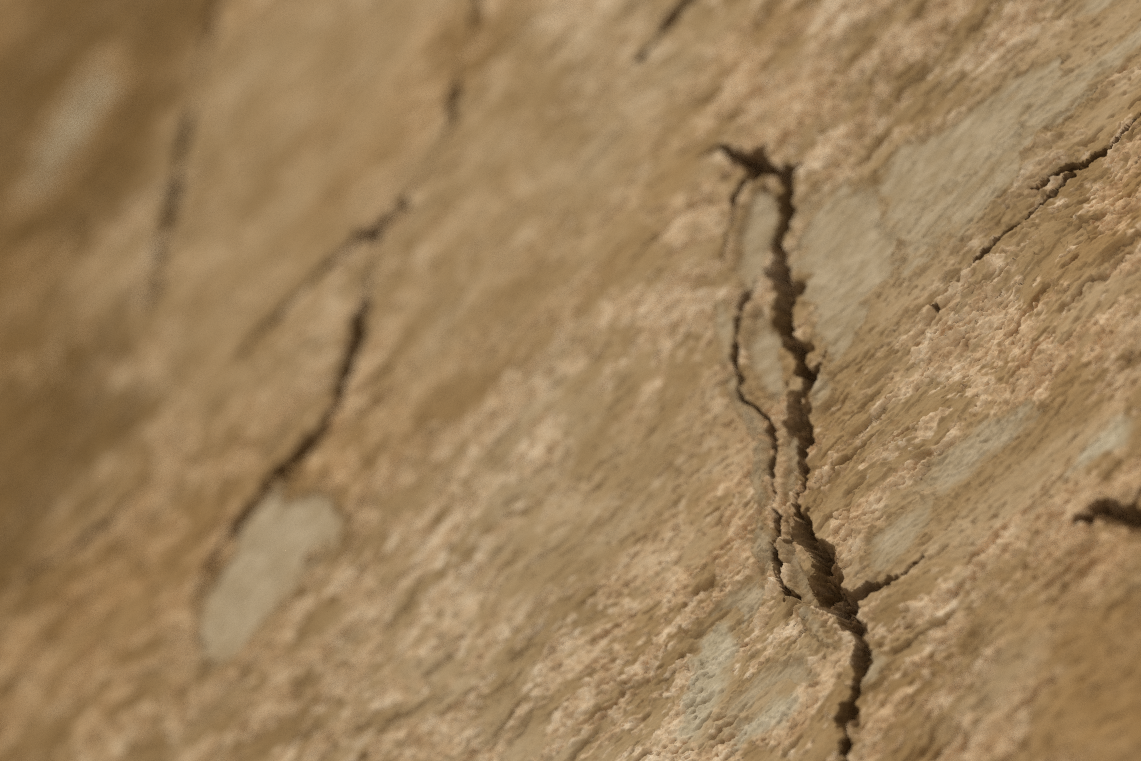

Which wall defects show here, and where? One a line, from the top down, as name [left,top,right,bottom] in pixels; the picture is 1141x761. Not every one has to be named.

crack [430,63,463,166]
crack [237,187,413,359]
crack [198,280,373,593]
crack [701,142,925,761]
spalling [193,472,348,675]